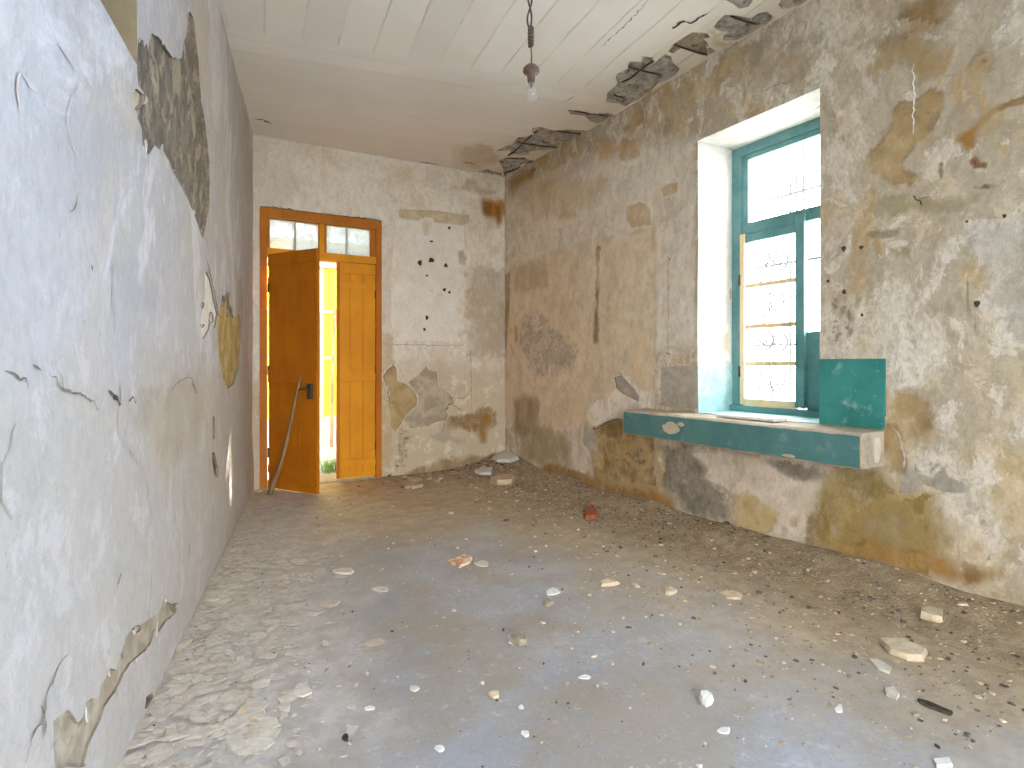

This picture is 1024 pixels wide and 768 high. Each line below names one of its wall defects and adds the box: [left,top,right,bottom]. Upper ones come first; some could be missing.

spalling [132,12,212,232]
spalling [475,127,583,175]
leakage [444,16,817,231]
spalling [566,0,772,122]
crack [672,13,708,29]
leakage [823,0,1024,358]
peeling [201,273,239,388]
peeling [383,365,452,431]
peeling [616,376,639,401]
leakage [623,353,1024,606]
spalling [53,599,179,768]